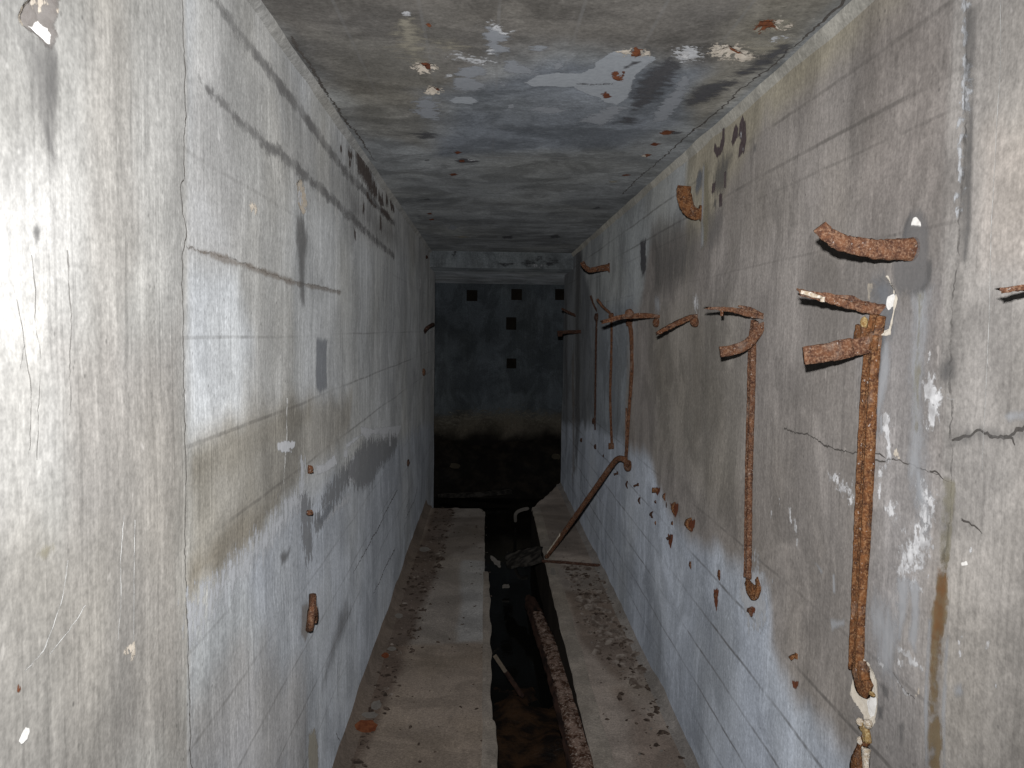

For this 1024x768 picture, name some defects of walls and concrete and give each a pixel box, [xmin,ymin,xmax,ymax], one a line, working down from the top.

spalling [18,0,59,49]
damp [255,53,292,104]
peeling [410,20,656,126]
spalling [670,42,765,63]
damp [297,144,395,259]
damp [316,425,401,484]
crack [784,428,982,560]
damp [873,296,948,670]
crack [949,414,1024,445]
spalling [850,660,878,727]
corrosion [924,574,947,768]